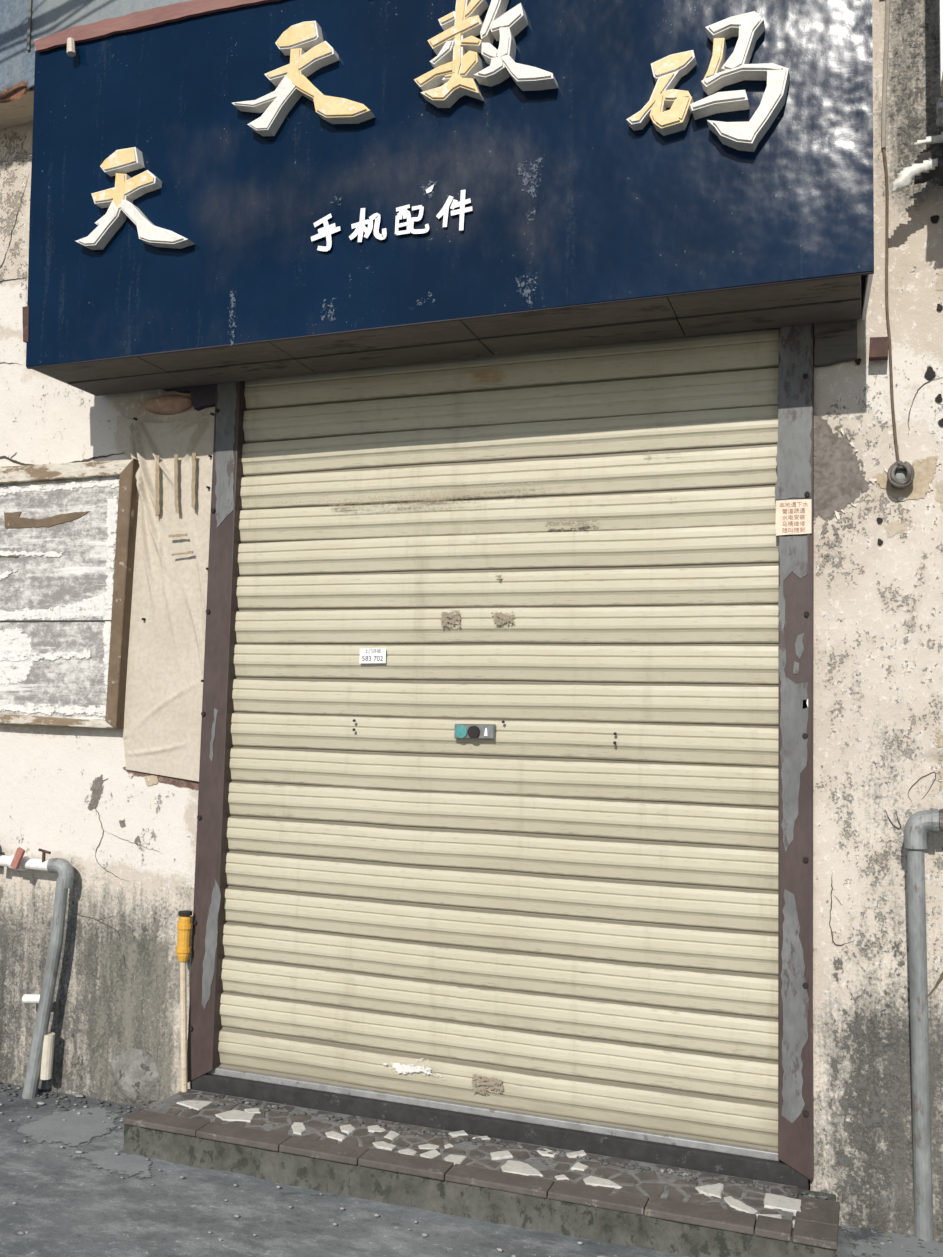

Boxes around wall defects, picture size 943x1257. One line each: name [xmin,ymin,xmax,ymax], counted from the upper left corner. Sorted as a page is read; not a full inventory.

peeling [775,324,943,851]
leakage [0,887,22,1081]
leakage [85,904,180,1107]
peeling [781,889,809,1123]
leakage [815,940,915,1240]
crack [928,972,943,996]